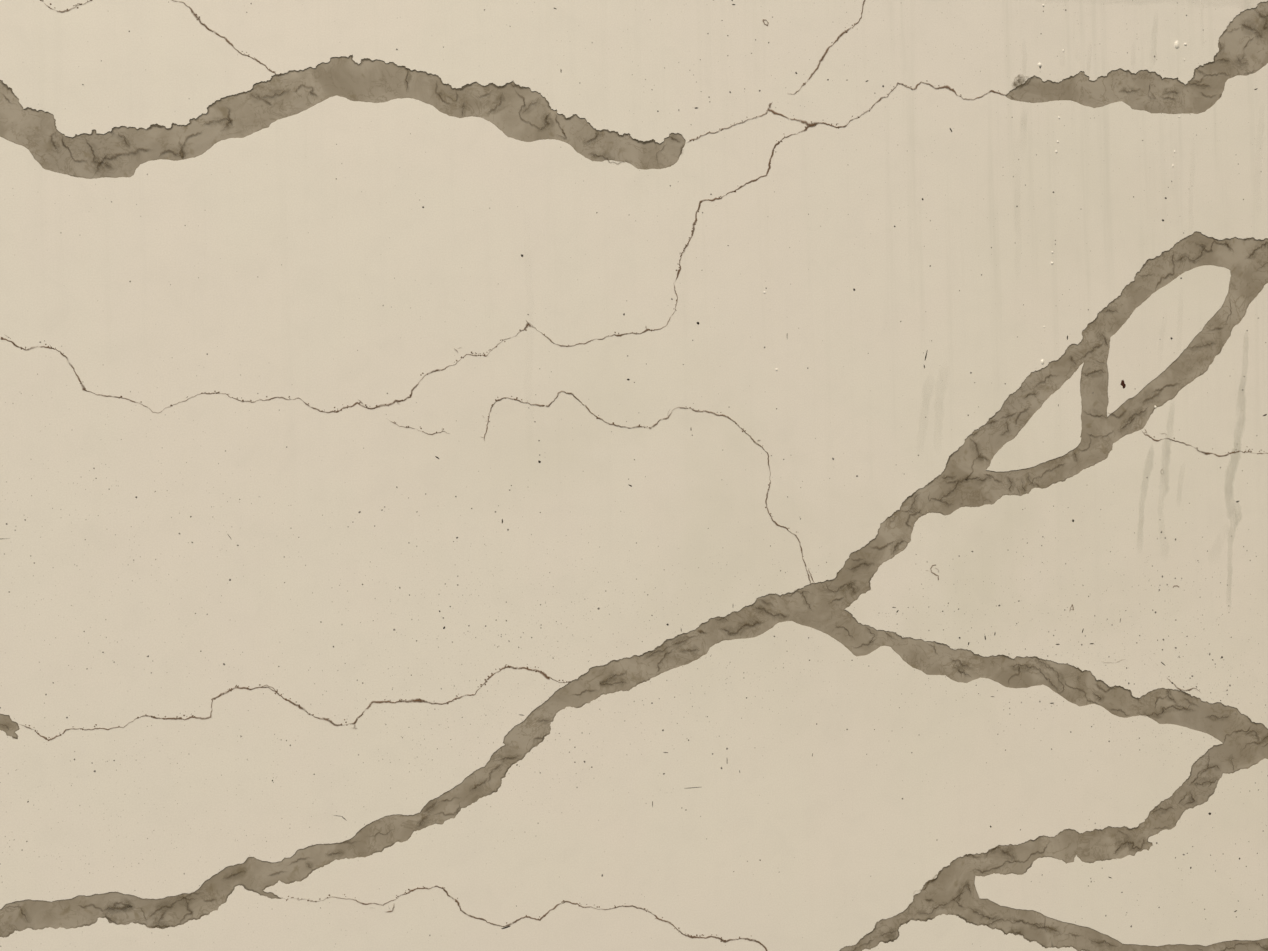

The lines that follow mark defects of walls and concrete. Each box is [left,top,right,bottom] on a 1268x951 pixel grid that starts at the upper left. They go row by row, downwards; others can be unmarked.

crack [0,0,1268,435]
crack [0,231,1268,951]